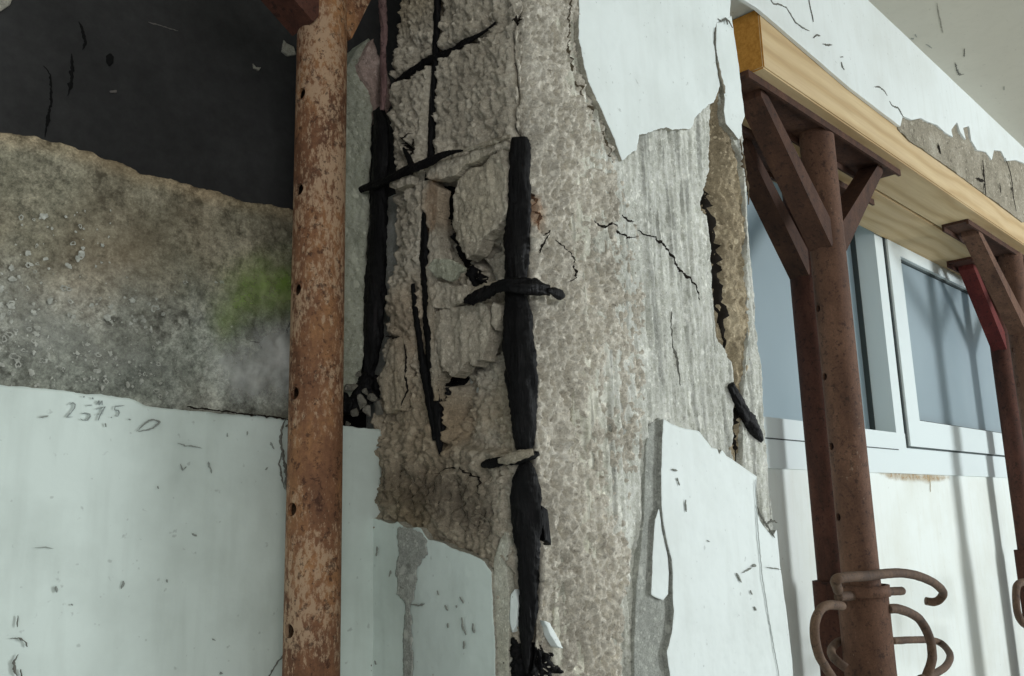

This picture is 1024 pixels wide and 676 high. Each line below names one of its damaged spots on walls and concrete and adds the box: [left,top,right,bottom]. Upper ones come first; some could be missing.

crack [44,22,87,135]
crack [771,0,845,70]
spalling [897,117,1024,222]
crack [594,17,750,462]
spalling [343,0,669,676]